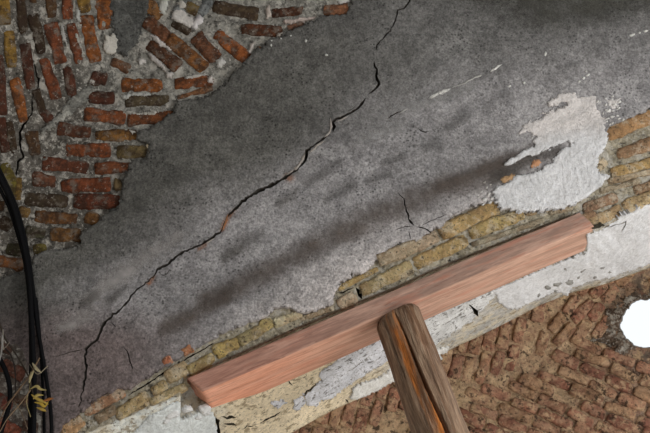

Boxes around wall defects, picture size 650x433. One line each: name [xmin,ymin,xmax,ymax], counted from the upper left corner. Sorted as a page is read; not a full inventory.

crack [15,64,40,175]
spalling [0,0,352,279]
crack [51,0,410,407]
spalling [61,92,650,433]
crack [396,193,444,238]